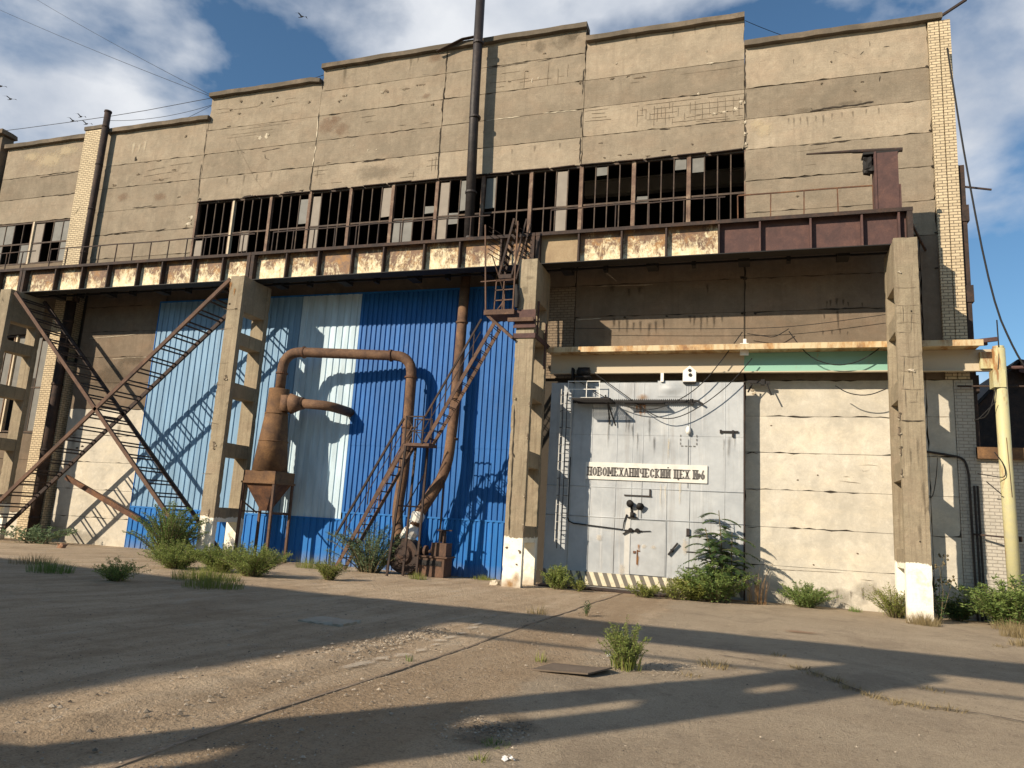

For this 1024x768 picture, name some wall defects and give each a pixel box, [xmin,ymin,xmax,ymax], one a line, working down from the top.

crack [412,54,447,173]